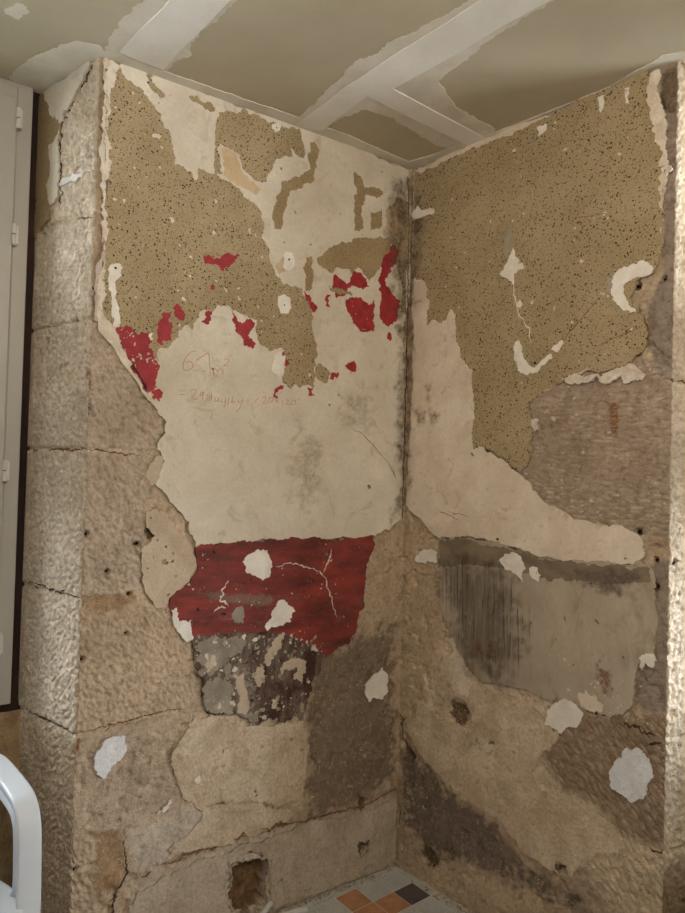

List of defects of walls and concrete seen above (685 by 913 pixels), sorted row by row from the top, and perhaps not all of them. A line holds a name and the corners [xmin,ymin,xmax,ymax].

peeling [34,61,91,242]
crack [33,447,139,456]
flaking render [94,57,673,913]
crack [28,582,80,601]
crack [276,549,336,615]
crack [27,709,183,734]
crack [109,788,401,913]